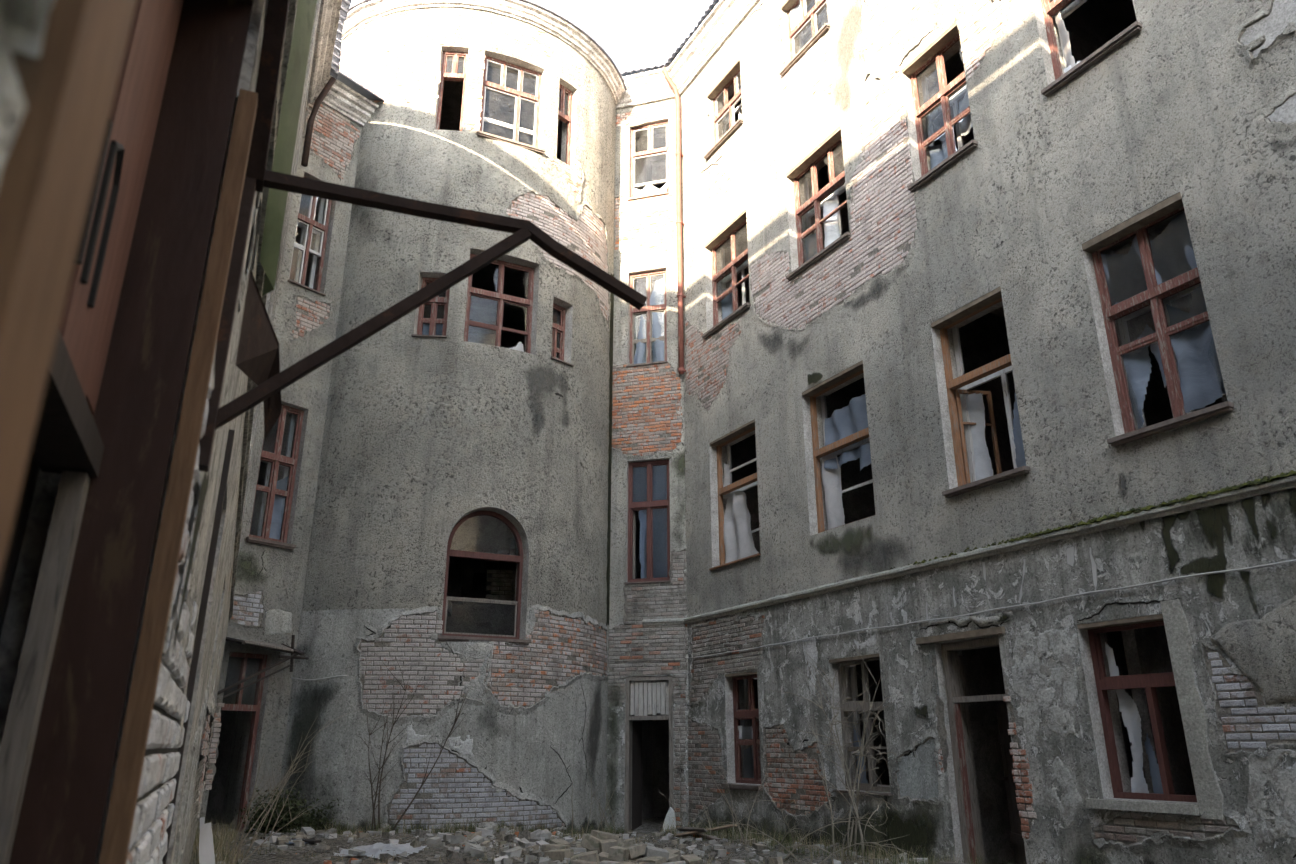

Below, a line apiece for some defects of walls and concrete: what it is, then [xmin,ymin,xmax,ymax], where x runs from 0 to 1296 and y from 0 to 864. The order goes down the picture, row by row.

spalling [339,9,445,105]
spalling [463,48,486,137]
spalling [616,0,836,134]
spalling [951,0,1017,83]
flaking render [1228,0,1296,68]
spalling [502,156,677,338]
spalling [611,66,923,460]
leakage [528,368,569,432]
leakage [840,540,904,572]
spalling [353,545,768,832]
spalling [761,717,838,824]
peeling [1003,629,1296,856]